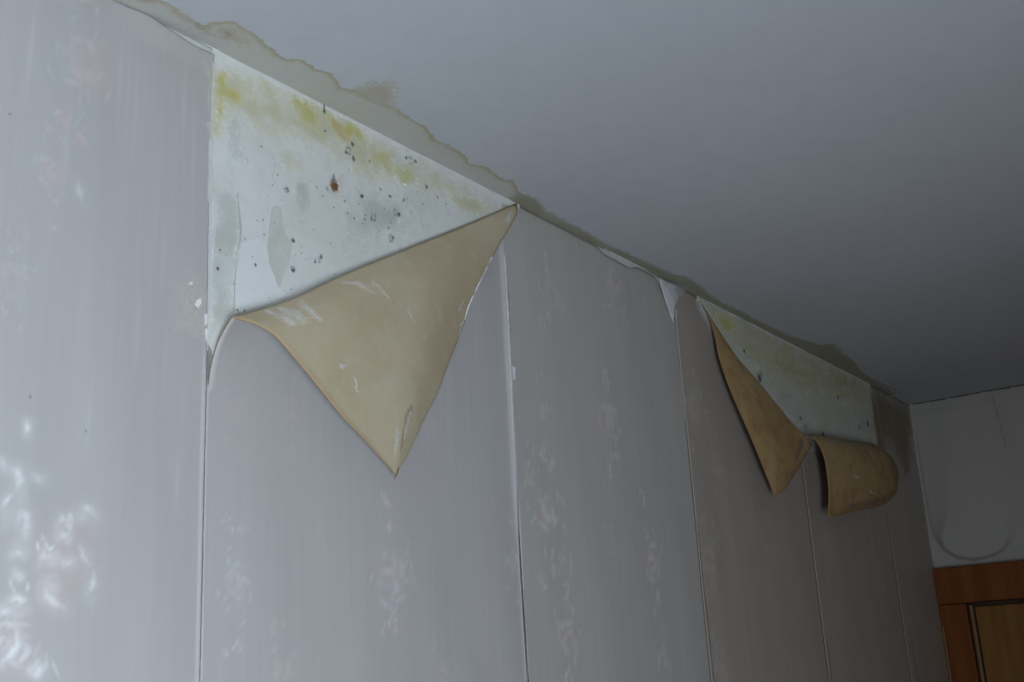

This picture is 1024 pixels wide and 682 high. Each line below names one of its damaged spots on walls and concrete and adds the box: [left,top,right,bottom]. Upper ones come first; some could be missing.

flaking render [207,50,520,355]
water stain [115,0,910,481]
flaking render [696,296,877,445]